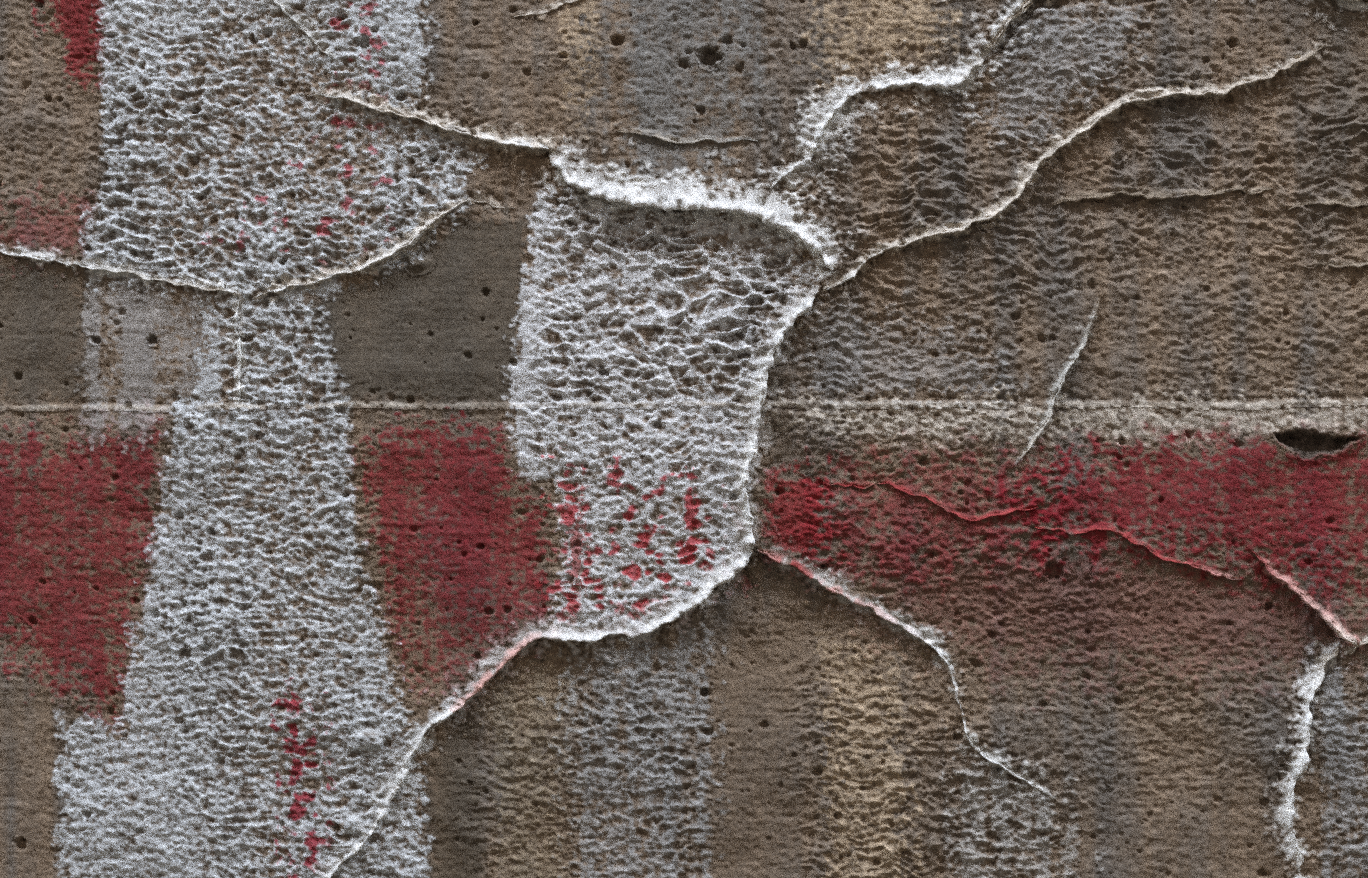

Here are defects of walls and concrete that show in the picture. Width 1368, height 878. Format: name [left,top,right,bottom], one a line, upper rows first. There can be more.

crack [259,0,340,62]
crack [0,190,516,403]
crack [298,0,1368,878]